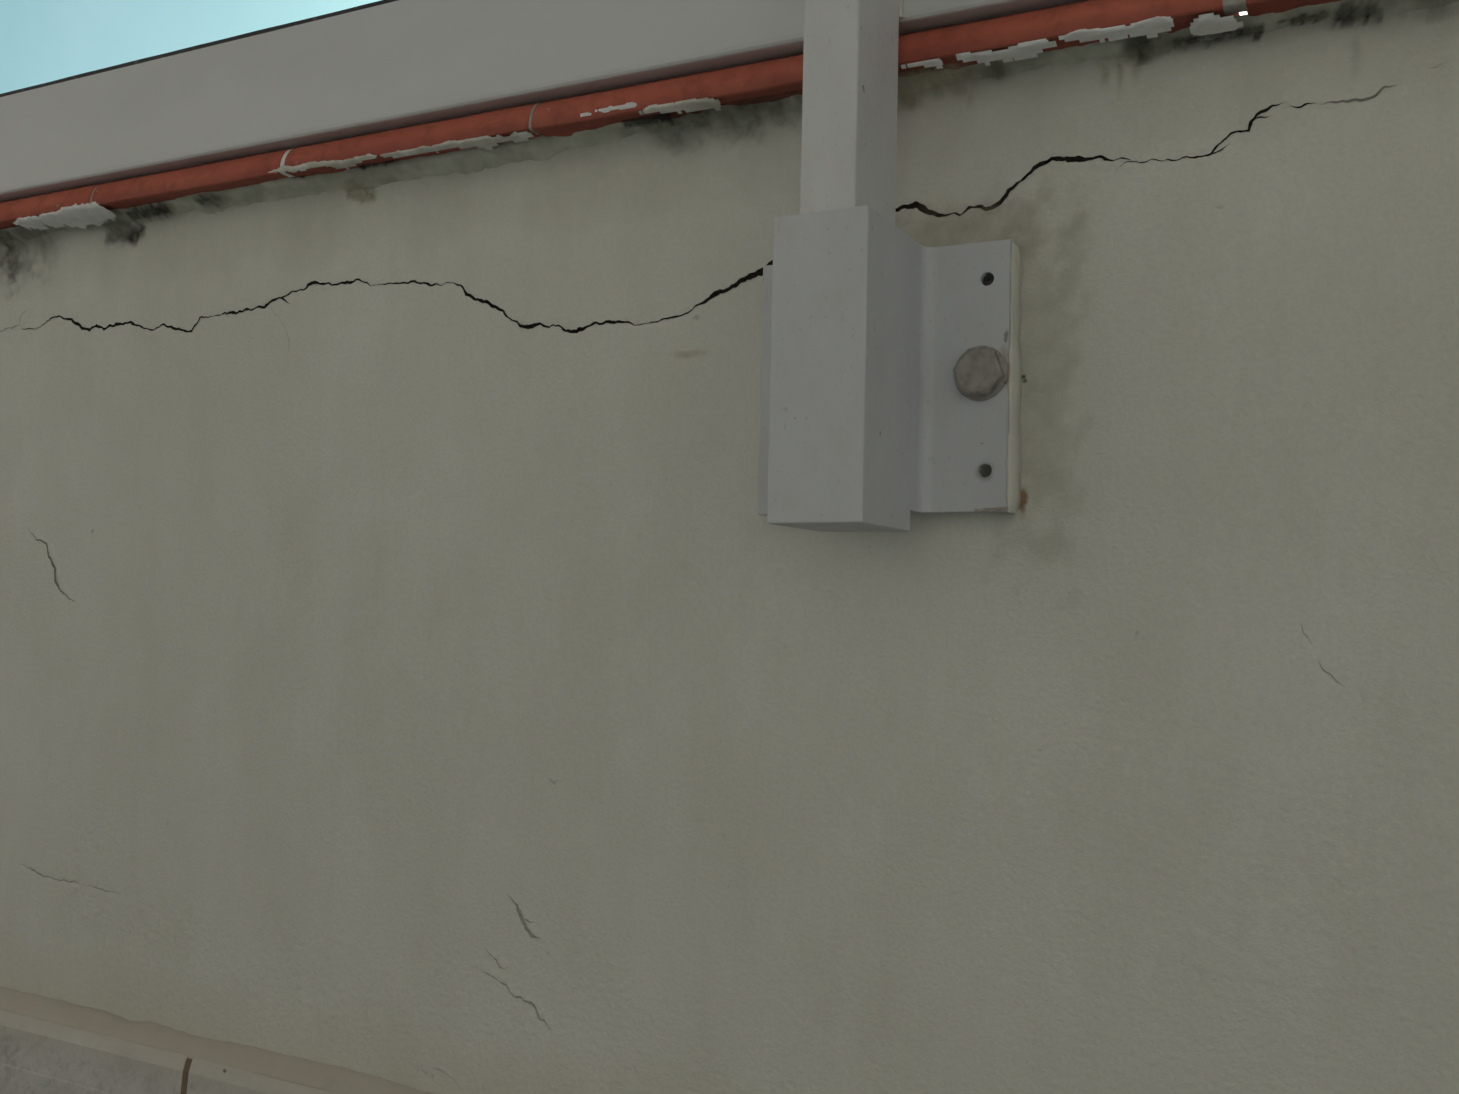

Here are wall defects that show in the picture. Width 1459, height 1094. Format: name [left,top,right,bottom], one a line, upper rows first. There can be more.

damp [1173,4,1381,47]
damp [1124,37,1154,61]
damp [898,66,957,104]
damp [622,113,672,127]
crack [895,62,1445,217]
damp [115,203,170,242]
crack [0,260,773,352]
crack [30,532,75,602]
crack [18,863,120,894]